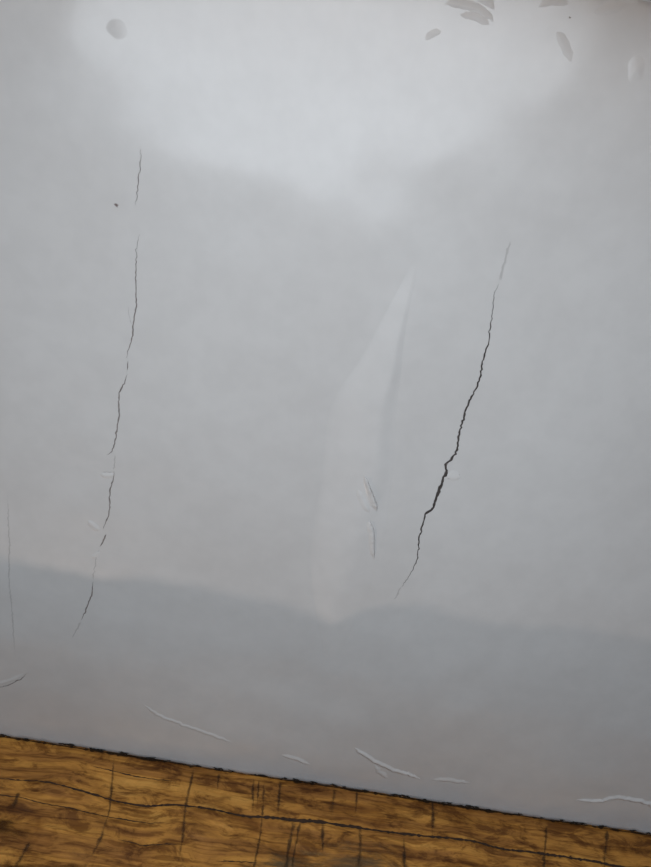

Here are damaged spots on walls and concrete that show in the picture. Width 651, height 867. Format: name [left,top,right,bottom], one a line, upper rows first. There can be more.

crack [87,239,139,559]
crack [403,287,498,585]